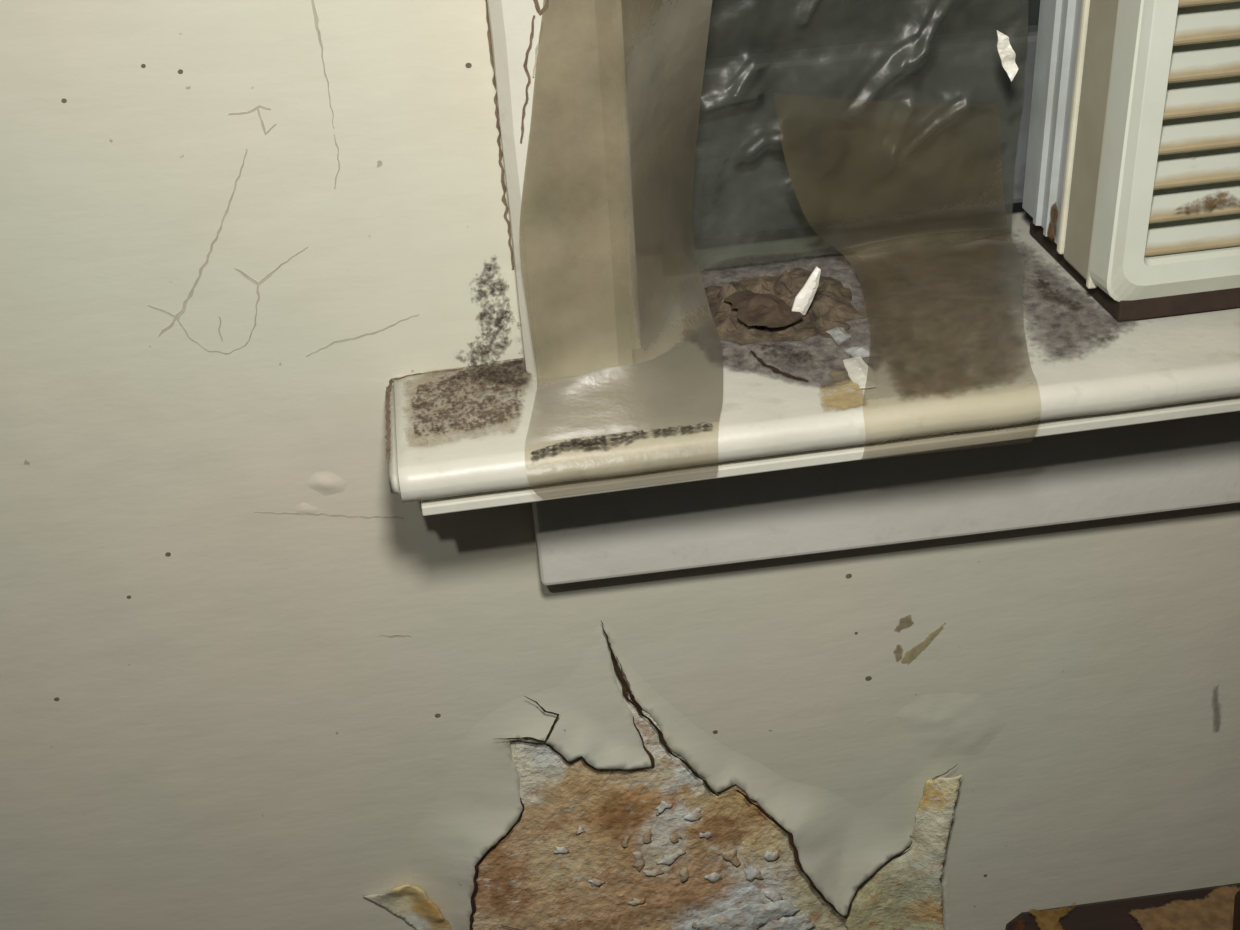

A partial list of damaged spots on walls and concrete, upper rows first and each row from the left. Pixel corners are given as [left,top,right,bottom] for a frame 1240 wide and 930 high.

crack [311,0,340,189]
crack [306,315,419,357]
leakage [407,258,529,444]
leakage [680,246,885,387]
leakage [987,233,1135,357]
peeling [363,615,962,930]